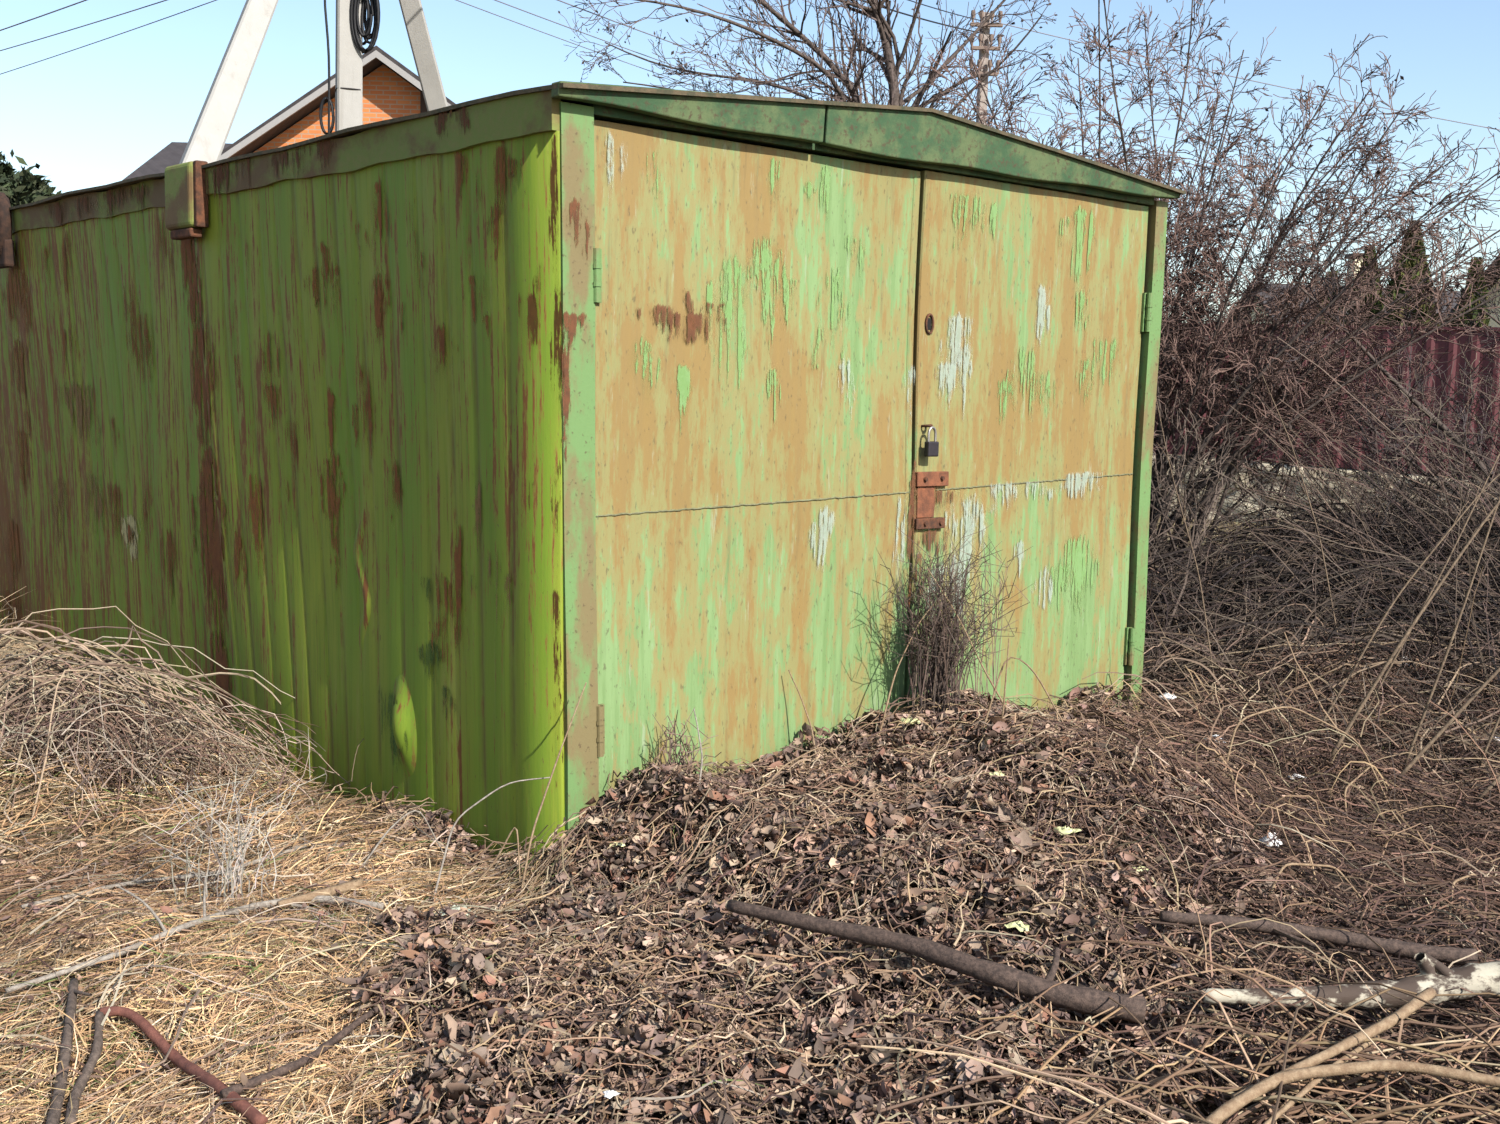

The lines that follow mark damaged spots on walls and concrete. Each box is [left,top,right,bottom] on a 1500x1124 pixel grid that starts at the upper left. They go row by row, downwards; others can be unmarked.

corrosion [456,146,522,261]
corrosion [517,135,590,530]
corrosion [638,288,727,343]
peeling [939,312,973,408]
peeling [121,515,141,560]
corrosion [141,239,264,726]
corrosion [319,366,376,592]
corrosion [429,483,511,672]
peeling [809,507,834,571]
corrosion [906,460,953,611]
corrosion [552,590,564,763]